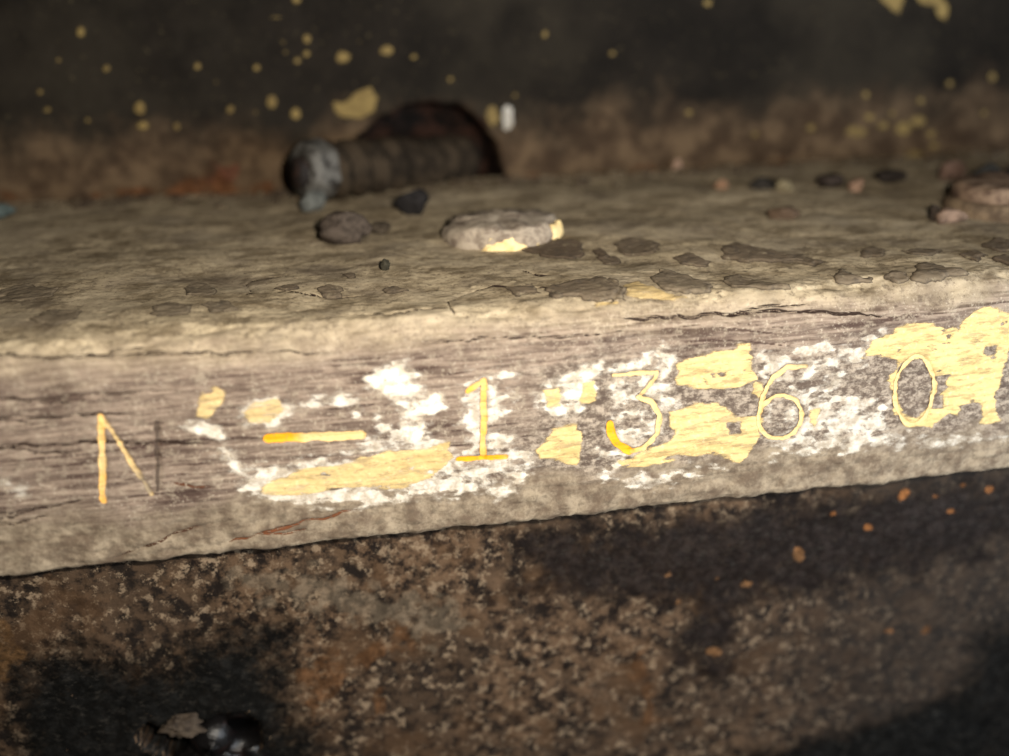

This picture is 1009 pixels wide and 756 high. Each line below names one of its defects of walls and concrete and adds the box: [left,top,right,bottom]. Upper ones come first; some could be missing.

crack [377,302,454,315]
crack [438,300,882,343]
crack [0,347,318,360]